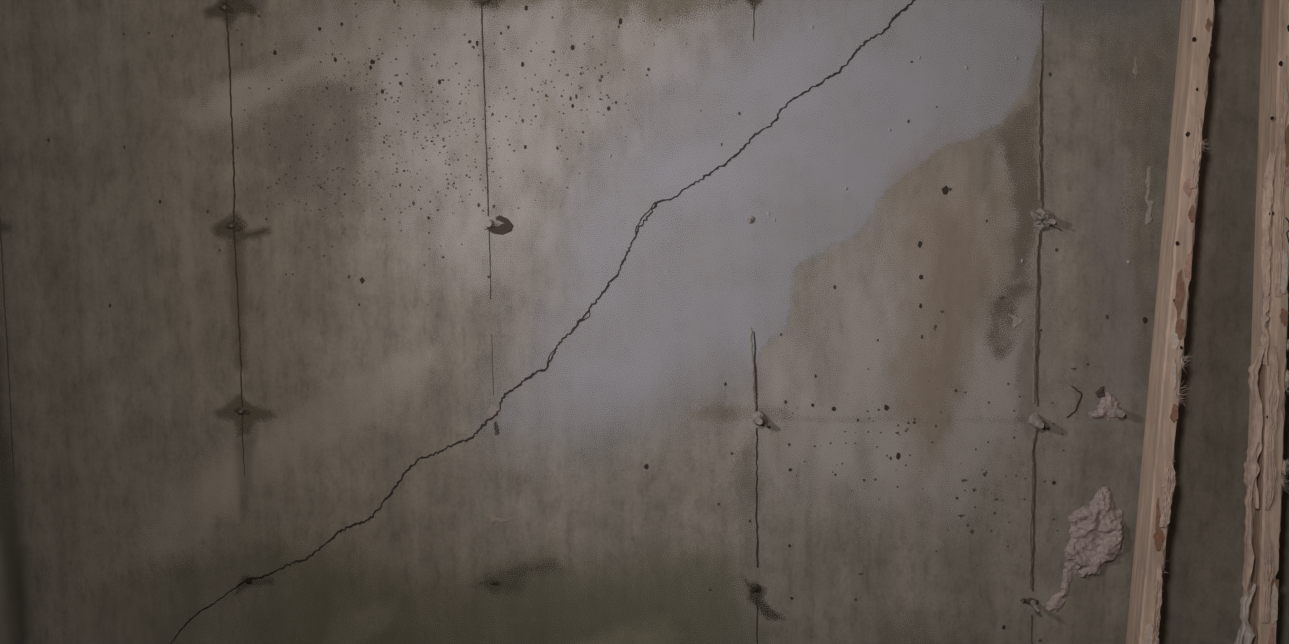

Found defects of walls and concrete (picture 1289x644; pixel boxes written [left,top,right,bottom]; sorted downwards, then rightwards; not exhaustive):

crack [170,0,915,644]